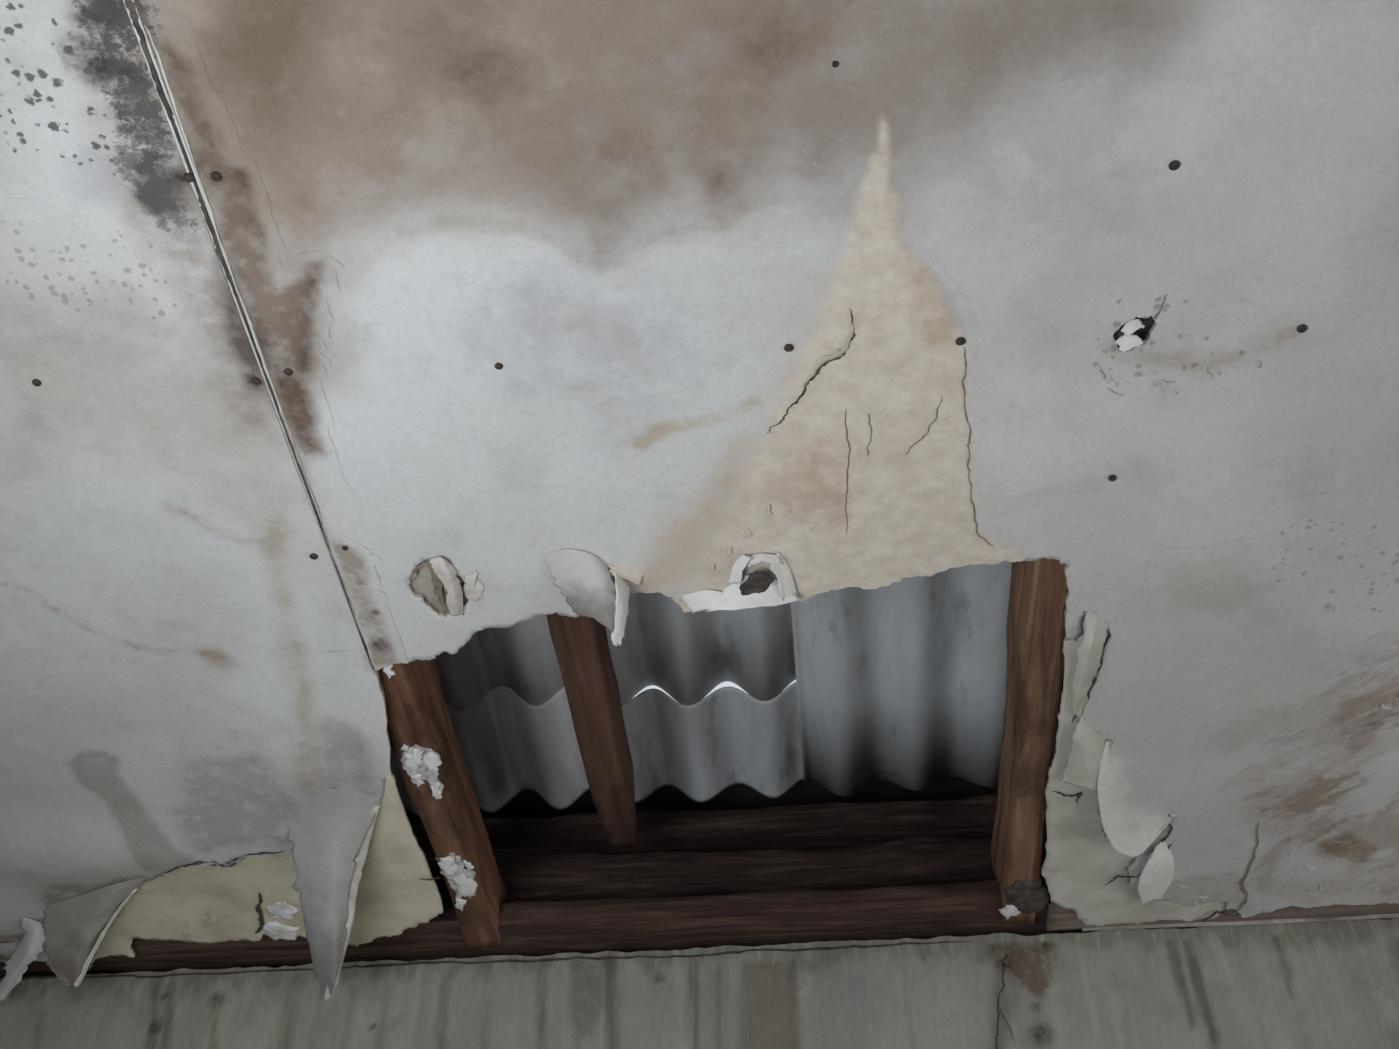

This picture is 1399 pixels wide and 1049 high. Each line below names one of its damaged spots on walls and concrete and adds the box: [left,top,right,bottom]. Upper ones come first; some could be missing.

leakage [0,0,1327,870]
peeling [680,109,1026,614]
peeling [0,772,443,1002]
peeling [545,548,644,646]
crack [995,952,1015,1049]
peeling [1041,611,1236,927]
leakage [1142,478,1399,918]